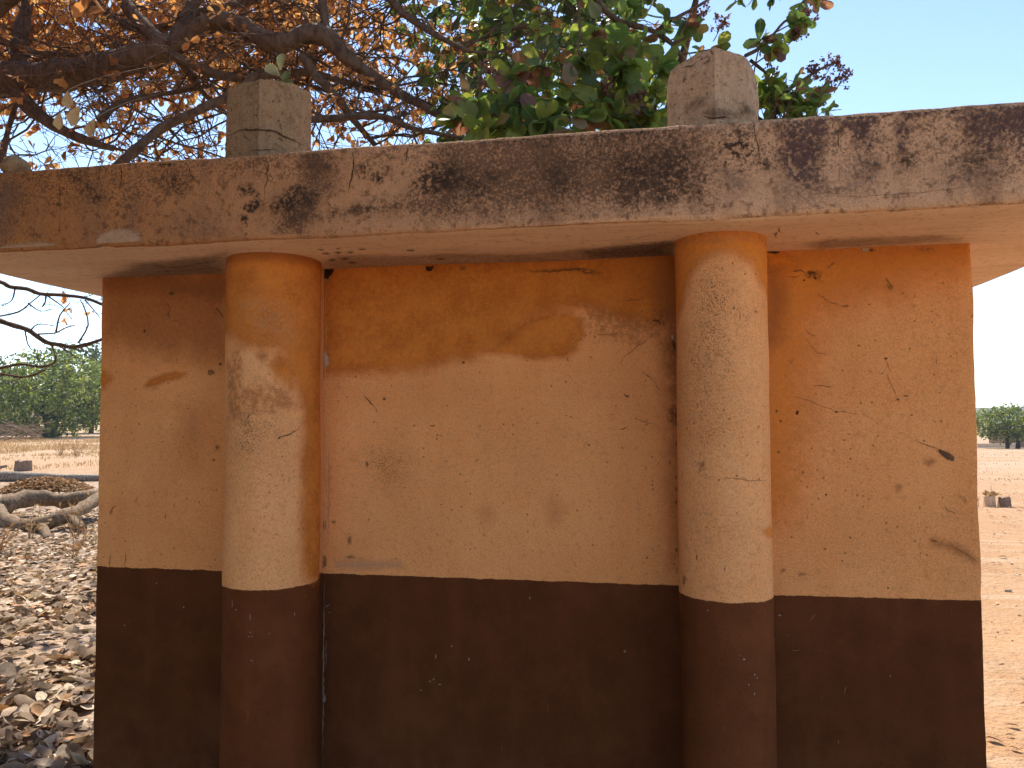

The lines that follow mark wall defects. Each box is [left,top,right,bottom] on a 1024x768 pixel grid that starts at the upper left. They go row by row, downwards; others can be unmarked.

crack [229,129,302,198]
water stain [239,153,333,234]
water stain [396,128,706,214]
water stain [715,116,878,188]
water stain [888,105,1024,174]
water stain [105,231,970,578]